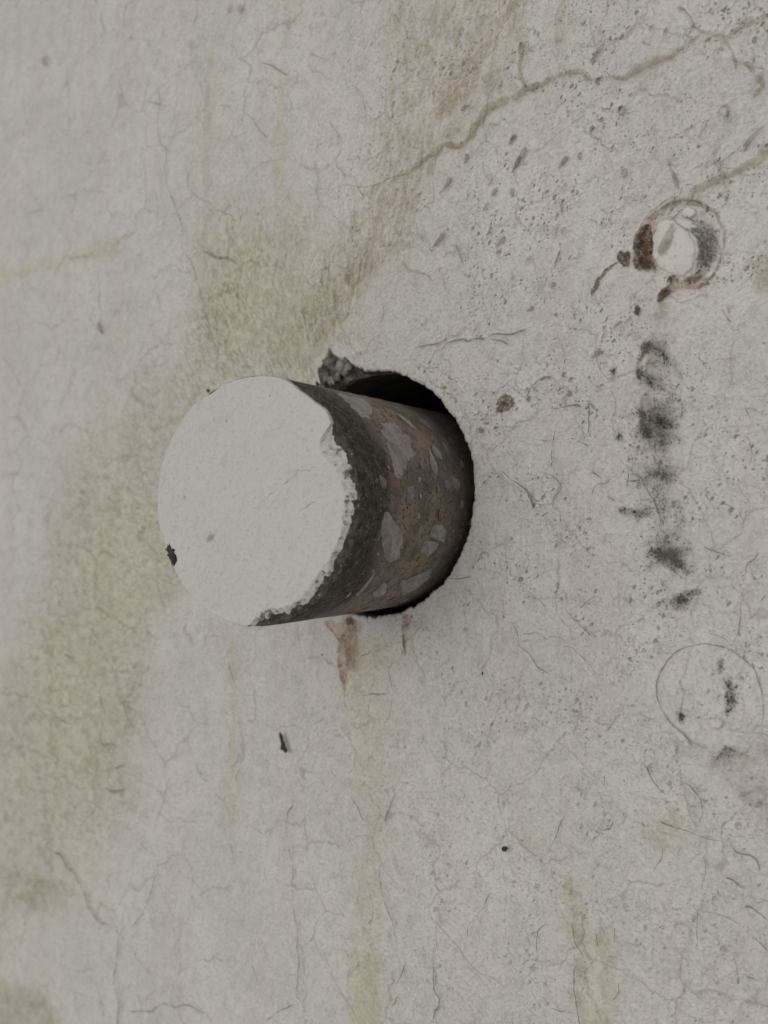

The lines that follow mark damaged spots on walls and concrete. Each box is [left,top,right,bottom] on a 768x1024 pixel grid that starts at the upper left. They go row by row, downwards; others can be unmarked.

rust [591,224,653,294]
rust [658,269,709,302]
spalling [316,347,393,390]